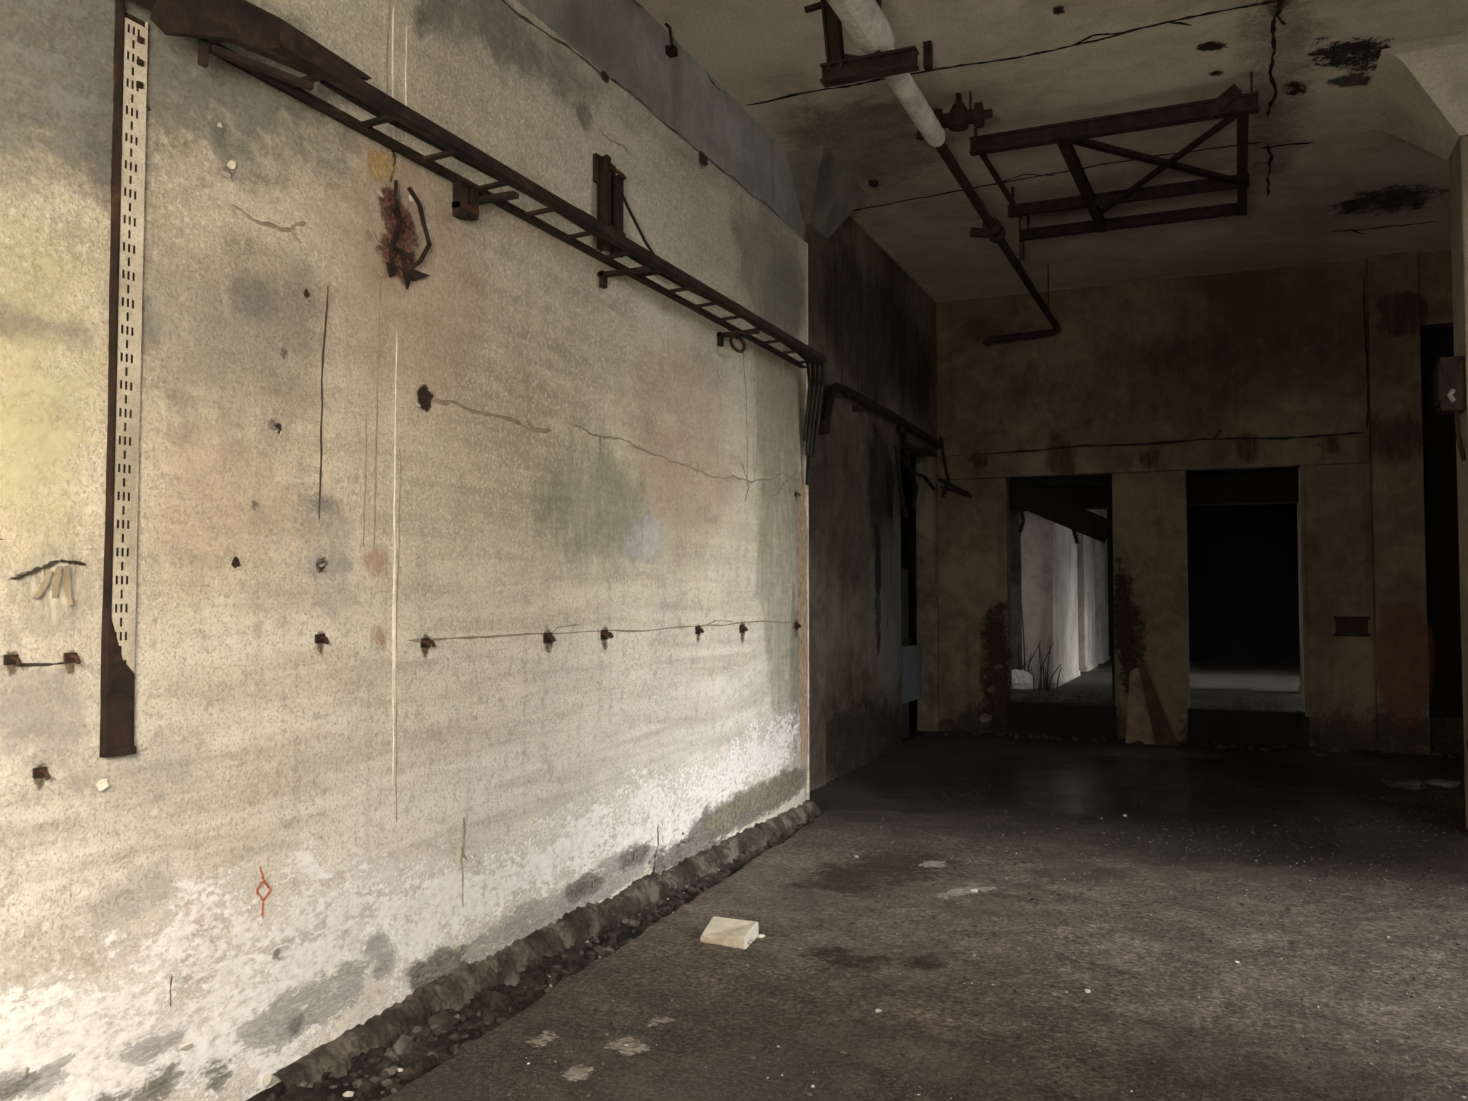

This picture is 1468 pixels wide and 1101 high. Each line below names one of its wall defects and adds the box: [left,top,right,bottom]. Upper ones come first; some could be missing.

crack [706,0,1314,211]
damp [1285,81,1308,96]
damp [1305,36,1393,87]
crack [318,286,329,519]
crack [363,275,795,823]
damp [0,702,801,1101]